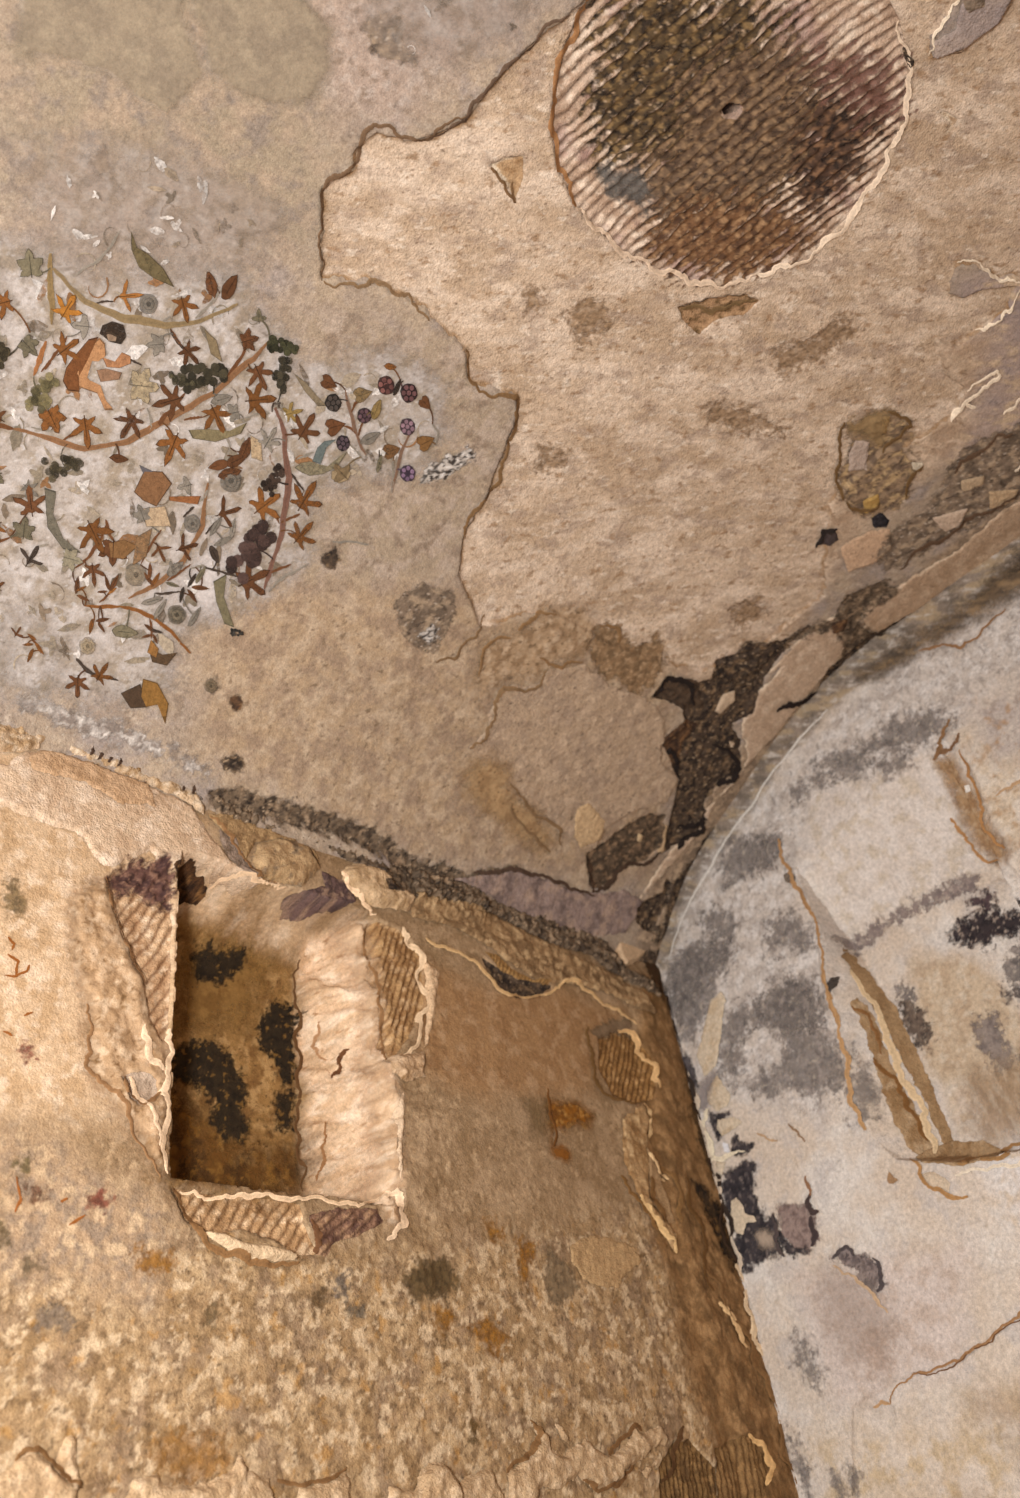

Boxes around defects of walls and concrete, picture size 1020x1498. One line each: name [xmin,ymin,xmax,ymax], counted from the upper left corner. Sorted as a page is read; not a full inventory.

flaking render [317,0,1020,893]
crack [777,616,906,712]
crack [663,828,714,935]
leakage [763,874,980,960]
flaking render [69,852,440,1269]
leakage [643,709,881,1274]
leakage [894,983,933,1054]
peeling [585,1016,714,1291]
leakage [831,1245,888,1313]
crack [873,1311,1020,1408]
peeling [0,1435,82,1498]
peeling [388,1420,776,1498]